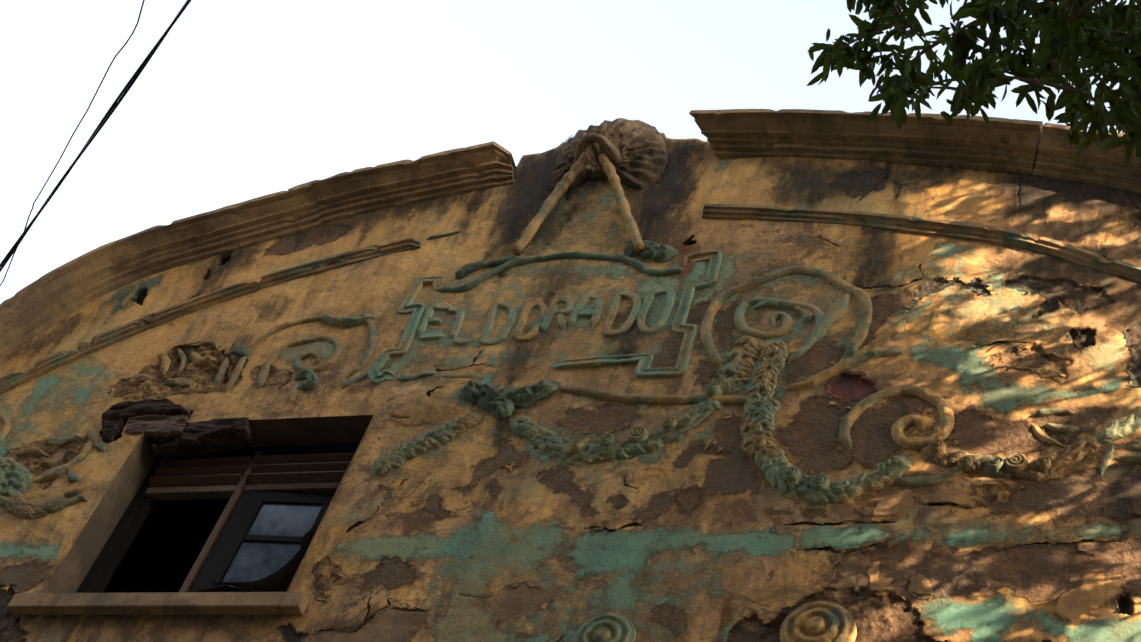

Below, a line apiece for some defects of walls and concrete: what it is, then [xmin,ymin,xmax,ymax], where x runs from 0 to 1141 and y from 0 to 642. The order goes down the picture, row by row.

water stain [763,157,960,208]
spalling [100,341,293,442]
spalling [860,274,1106,383]
spalling [1124,321,1141,388]
spalling [4,435,88,489]
peeling [0,559,55,642]
peeling [310,554,417,603]
peeling [727,538,1141,642]